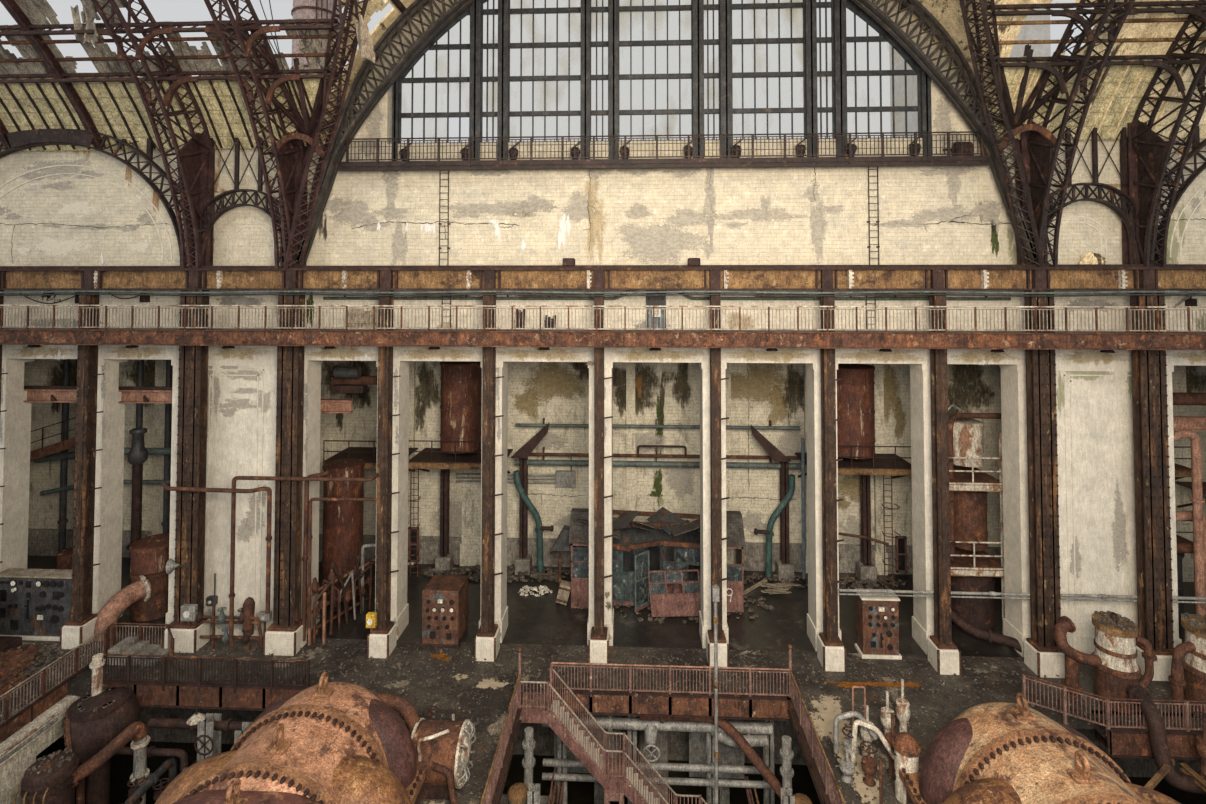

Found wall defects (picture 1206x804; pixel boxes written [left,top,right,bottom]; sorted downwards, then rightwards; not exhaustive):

peeling [442,192,600,222]
peeling [586,157,845,265]
water stain [409,347,470,430]
water stain [613,349,696,418]